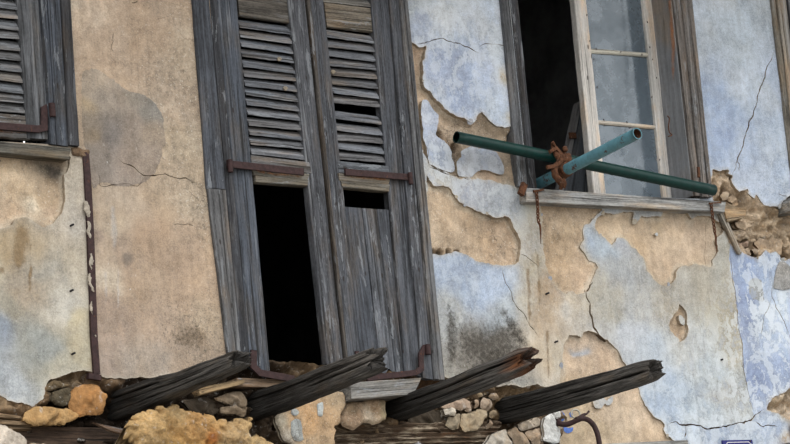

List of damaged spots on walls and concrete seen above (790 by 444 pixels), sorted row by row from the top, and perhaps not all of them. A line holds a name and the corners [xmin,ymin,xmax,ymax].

flaking render [412,45,515,186]
flaking render [0,157,68,228]
flaking render [427,182,518,266]
flaking render [541,171,790,295]
leakage [448,308,524,364]
flaking render [559,332,625,383]
flaking render [669,306,686,344]
flaking render [435,385,671,444]
crack [671,411,774,435]
flaking render [767,388,790,420]